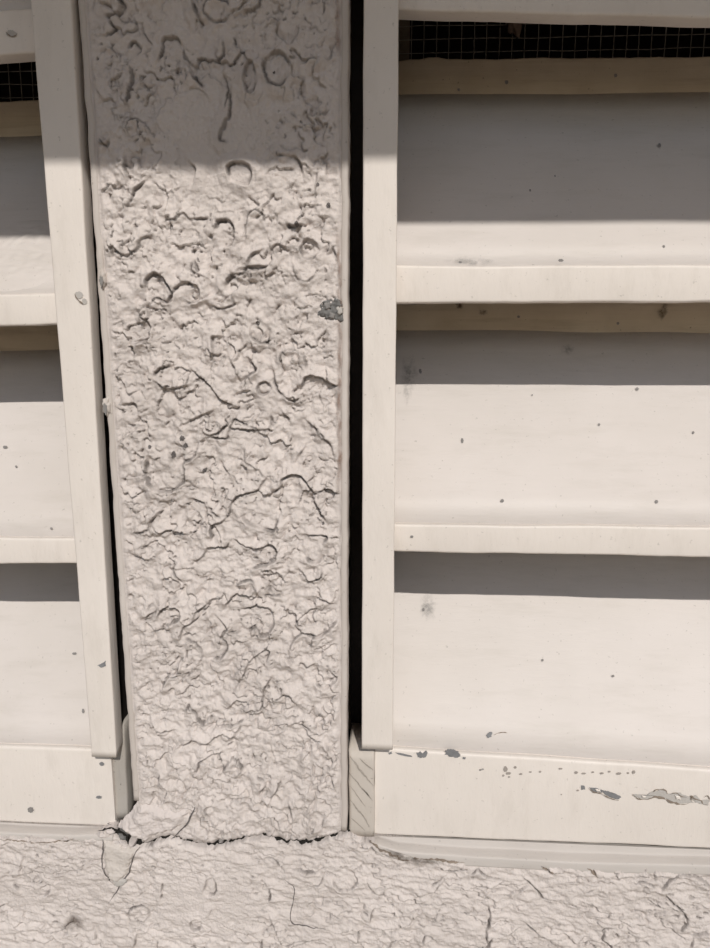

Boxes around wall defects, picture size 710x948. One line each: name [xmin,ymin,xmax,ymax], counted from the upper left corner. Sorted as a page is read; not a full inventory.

peeling [575,770,635,801]
peeling [633,789,710,805]
crack [98,756,373,902]